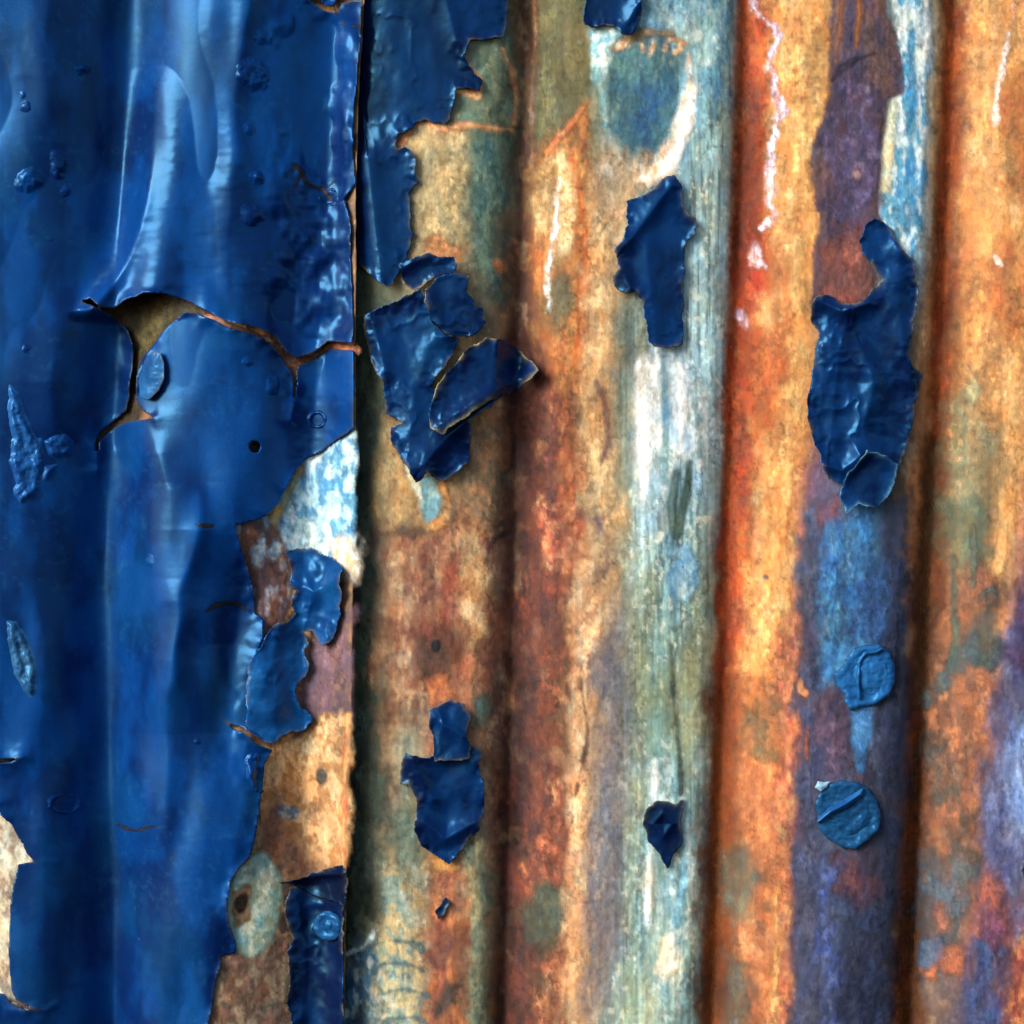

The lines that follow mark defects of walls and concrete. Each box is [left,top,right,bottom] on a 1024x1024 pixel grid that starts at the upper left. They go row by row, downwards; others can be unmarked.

rust [456,64,483,99]
peeling [245,426,360,744]
peeling [356,0,538,482]
rust [376,102,631,1024]
peeling [613,175,698,349]
rust [696,0,828,1024]
peeling [807,218,923,514]
rust [892,0,1024,1024]
peeling [0,815,33,1005]
peeling [227,853,348,1024]
peeling [400,699,485,864]
peeling [643,799,684,868]